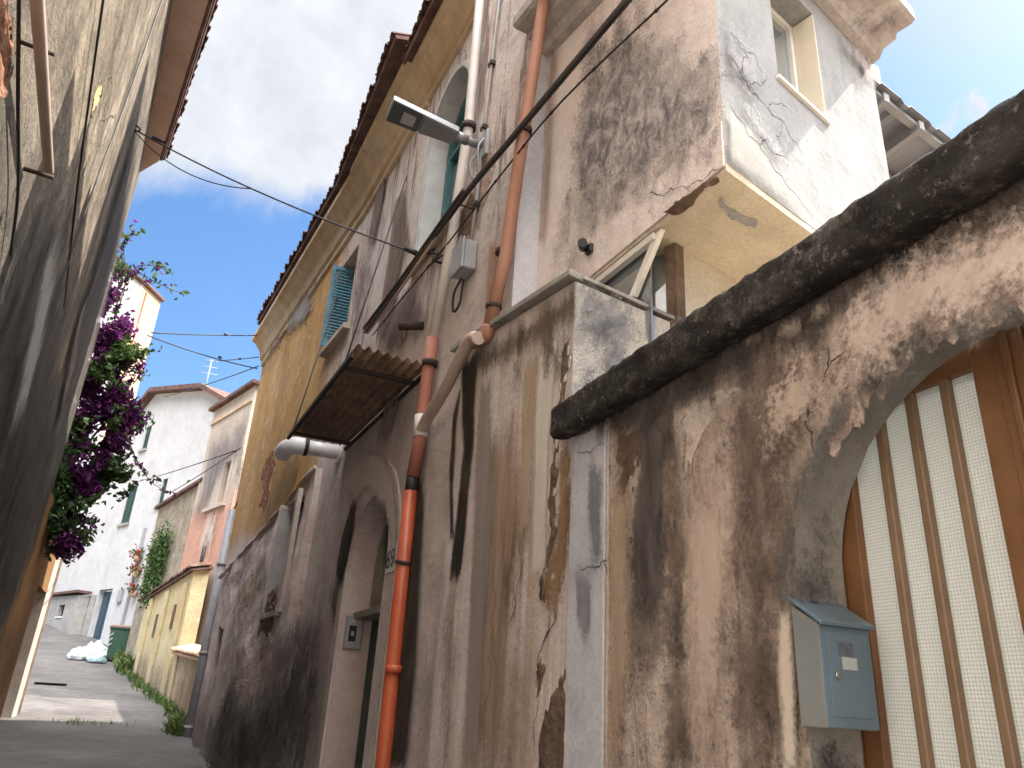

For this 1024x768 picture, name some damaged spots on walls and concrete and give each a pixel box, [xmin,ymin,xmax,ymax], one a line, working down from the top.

water stain [553,0,786,269]
flaking render [719,197,758,228]
crack [729,32,812,216]
spalling [258,450,276,514]
water stain [449,286,576,768]
crack [483,439,605,755]
crack [558,337,571,403]
water stain [576,577,590,637]
water stain [584,191,1018,768]
crack [789,343,849,449]
flaking render [759,207,1024,458]
spalling [535,654,566,768]